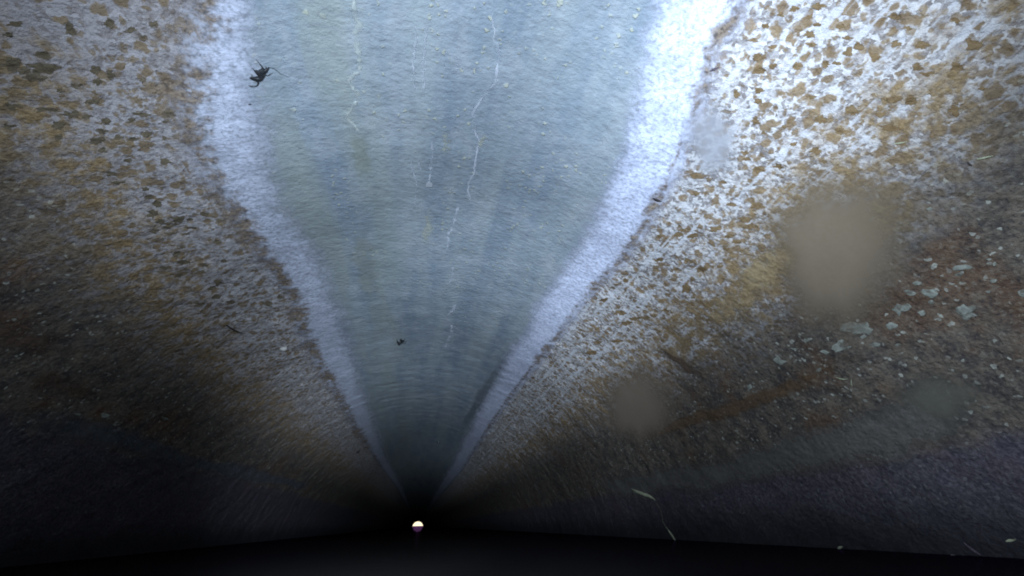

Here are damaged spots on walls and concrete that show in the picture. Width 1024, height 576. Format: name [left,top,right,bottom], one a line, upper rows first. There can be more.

crack [347,0,365,131]
crack [491,9,499,77]
crack [445,131,480,347]
peeling [952,264,973,276]
peeling [886,281,938,330]
peeling [955,304,978,321]
peeling [820,321,880,355]